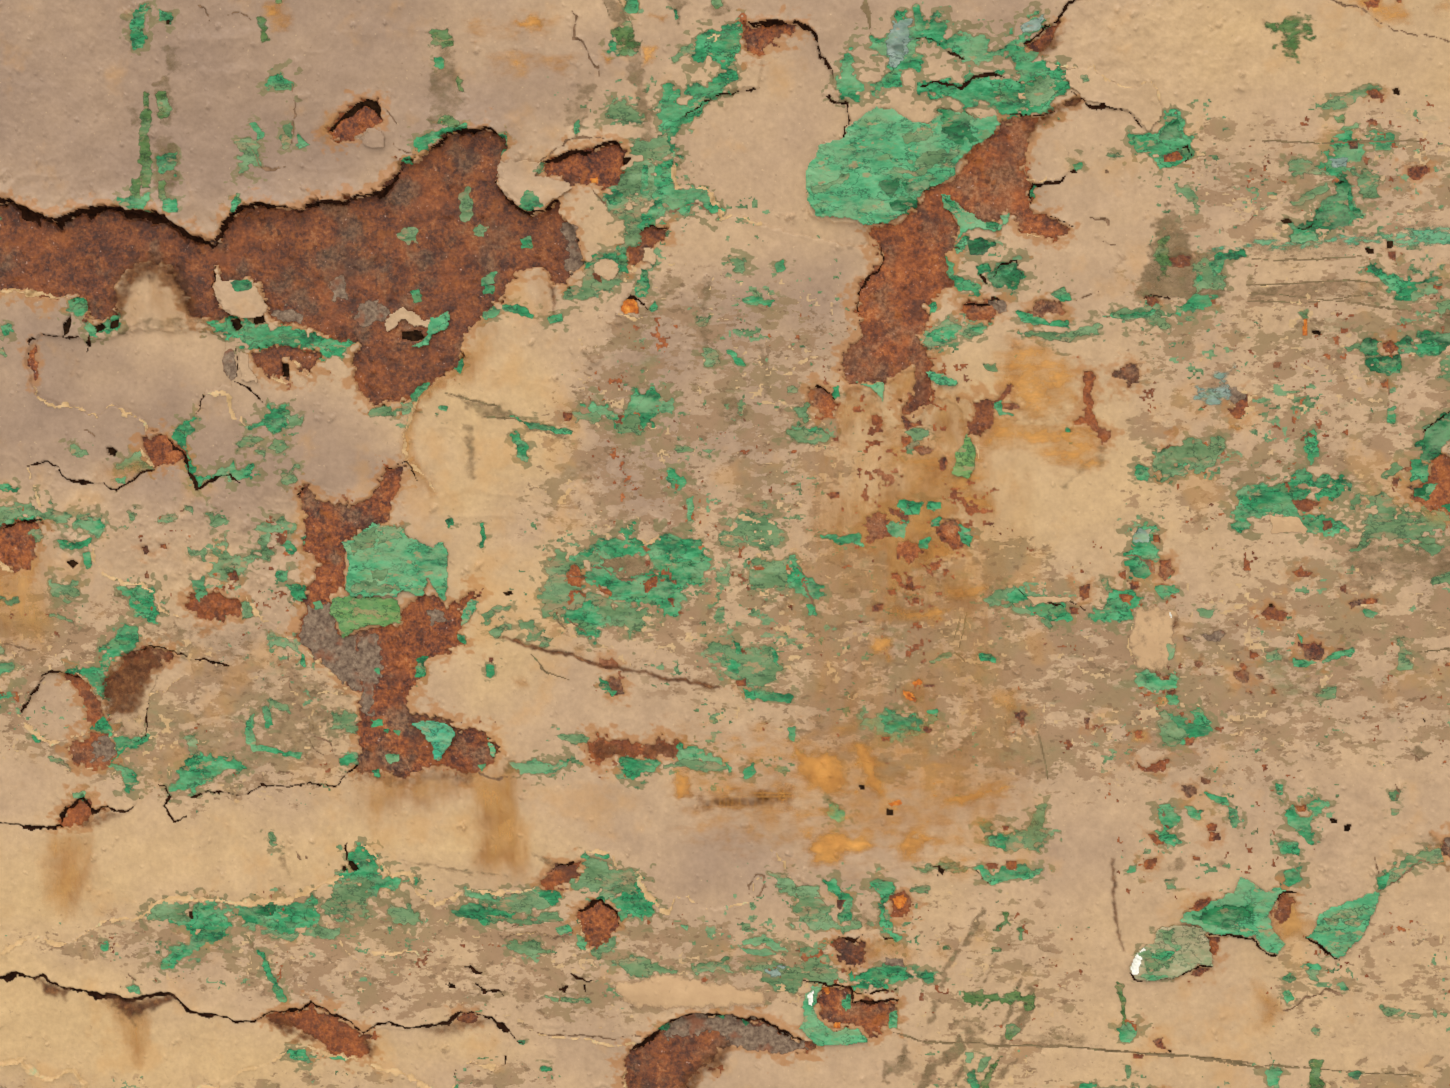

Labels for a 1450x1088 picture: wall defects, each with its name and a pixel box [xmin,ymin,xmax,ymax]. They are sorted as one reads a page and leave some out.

crack [1023,0,1075,44]
peeling [497,150,572,211]
rust [540,135,631,190]
crack [684,87,756,117]
peeling [671,19,1001,247]
crack [916,37,1055,117]
peeling [211,266,268,318]
rust [1120,249,1258,319]
rust [758,98,1157,703]
rust [0,121,585,779]
peeling [1130,877,1286,982]
crack [0,971,641,1072]